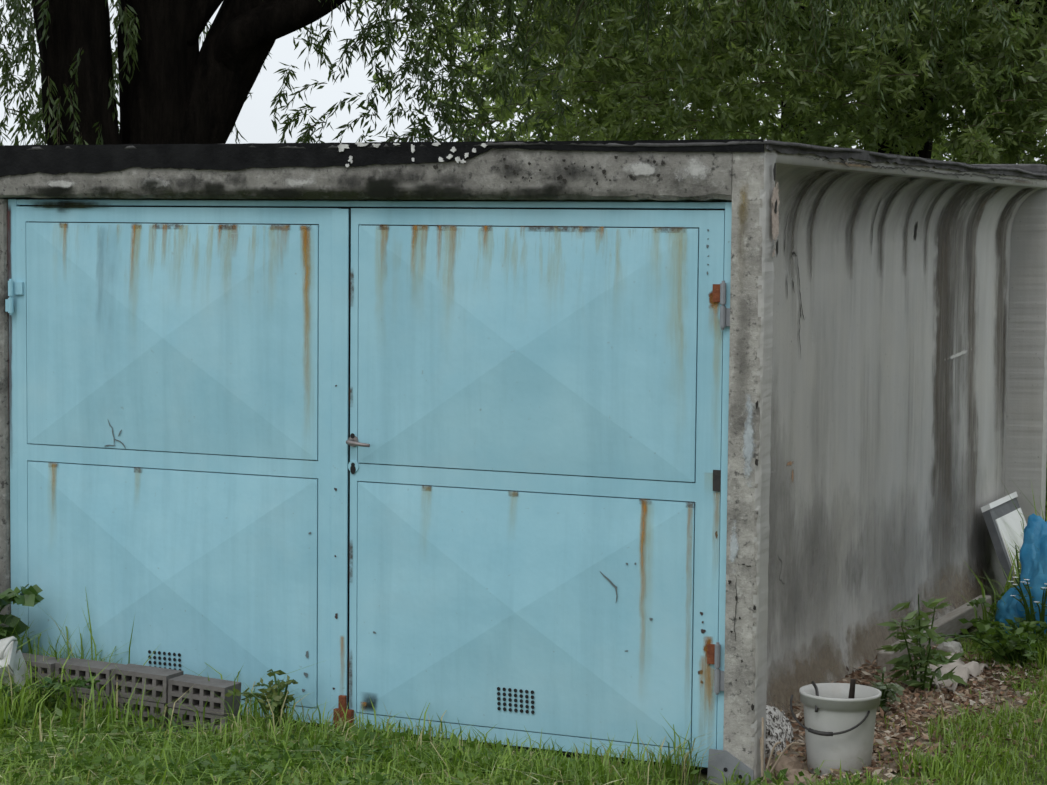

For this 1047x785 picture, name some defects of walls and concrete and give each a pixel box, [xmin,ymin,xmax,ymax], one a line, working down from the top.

peeling [345,142,415,168]
peeling [432,142,487,164]
water stain [28,166,587,210]
water stain [881,178,1033,538]
water stain [769,467,777,575]